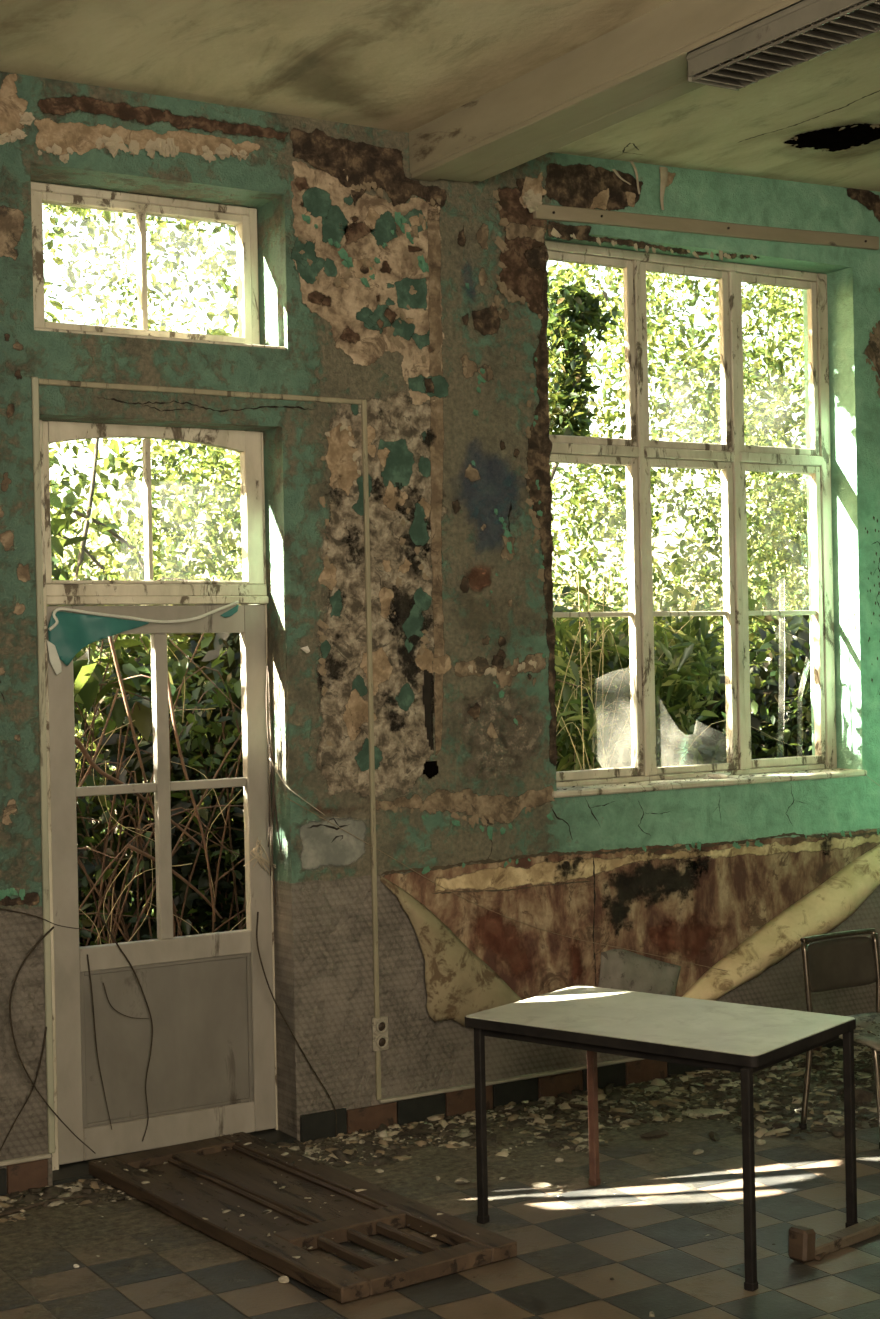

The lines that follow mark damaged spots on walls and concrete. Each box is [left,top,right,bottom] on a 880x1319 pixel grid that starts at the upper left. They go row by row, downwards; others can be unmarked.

spalling [844,187,880,222]
flaking render [864,320,880,398]
flaking render [0,73,555,840]
peeling [454,161,759,766]
damp [546,857,584,880]
peeling [381,828,880,1000]
damp [602,850,709,936]